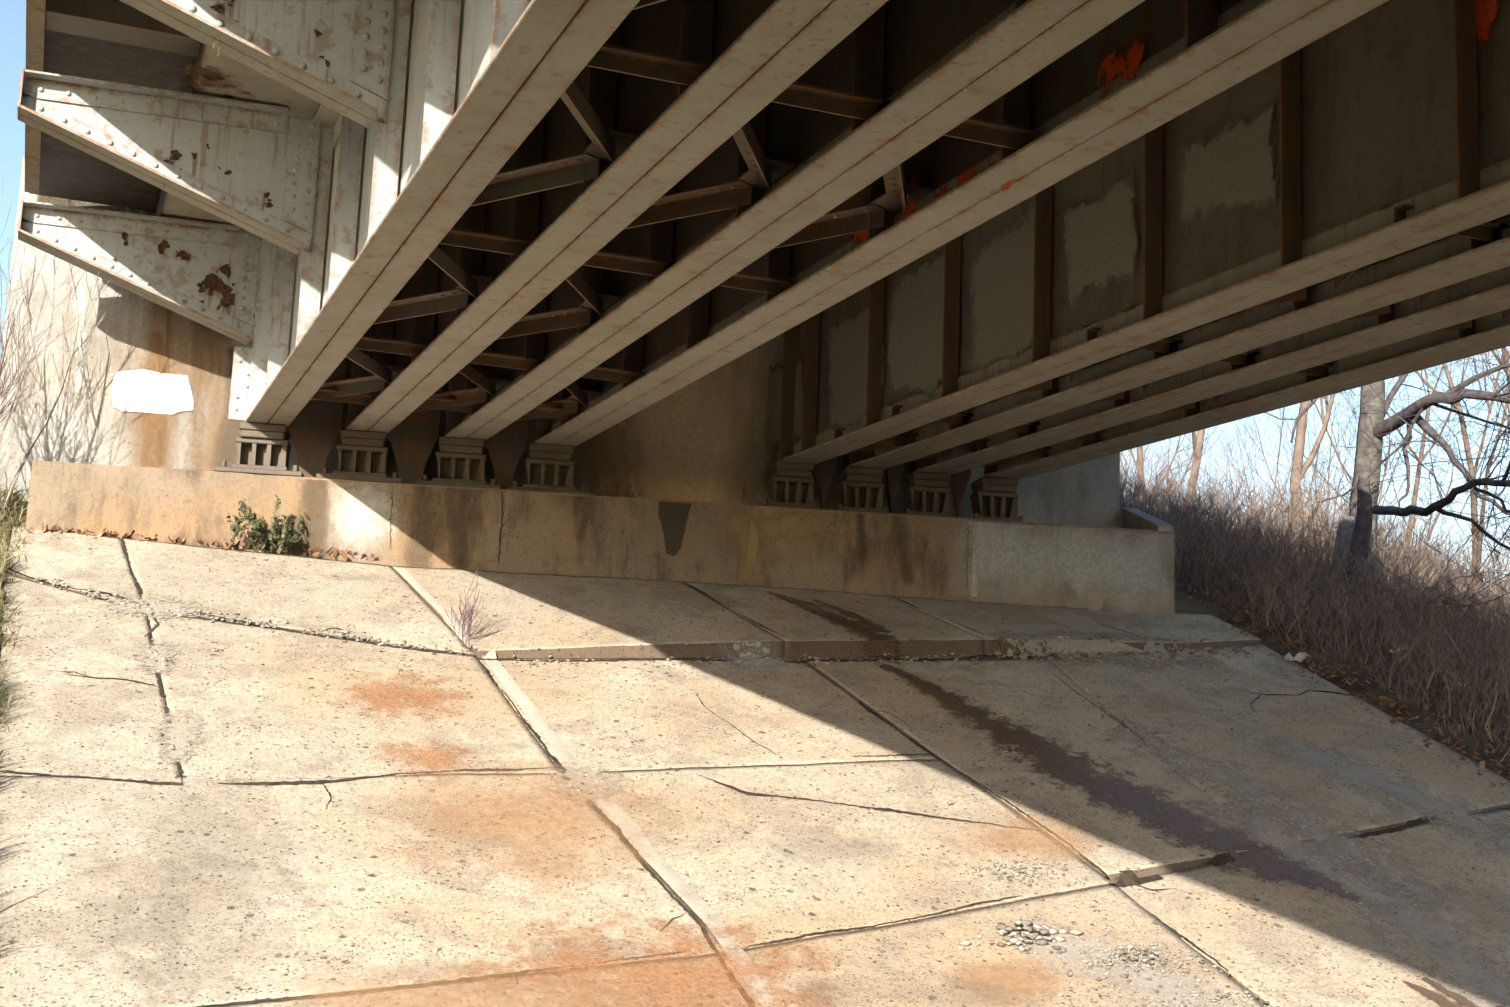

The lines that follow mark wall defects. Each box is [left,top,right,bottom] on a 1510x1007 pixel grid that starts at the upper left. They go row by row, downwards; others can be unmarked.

damp [621,355,760,584]
damp [972,521,1159,612]
spalling [99,596,207,675]
spalling [152,709,206,764]
crack [0,524,1146,1007]
damp [766,591,1360,900]
crack [1234,688,1365,714]
crack [698,701,1229,971]
crack [1209,853,1235,867]